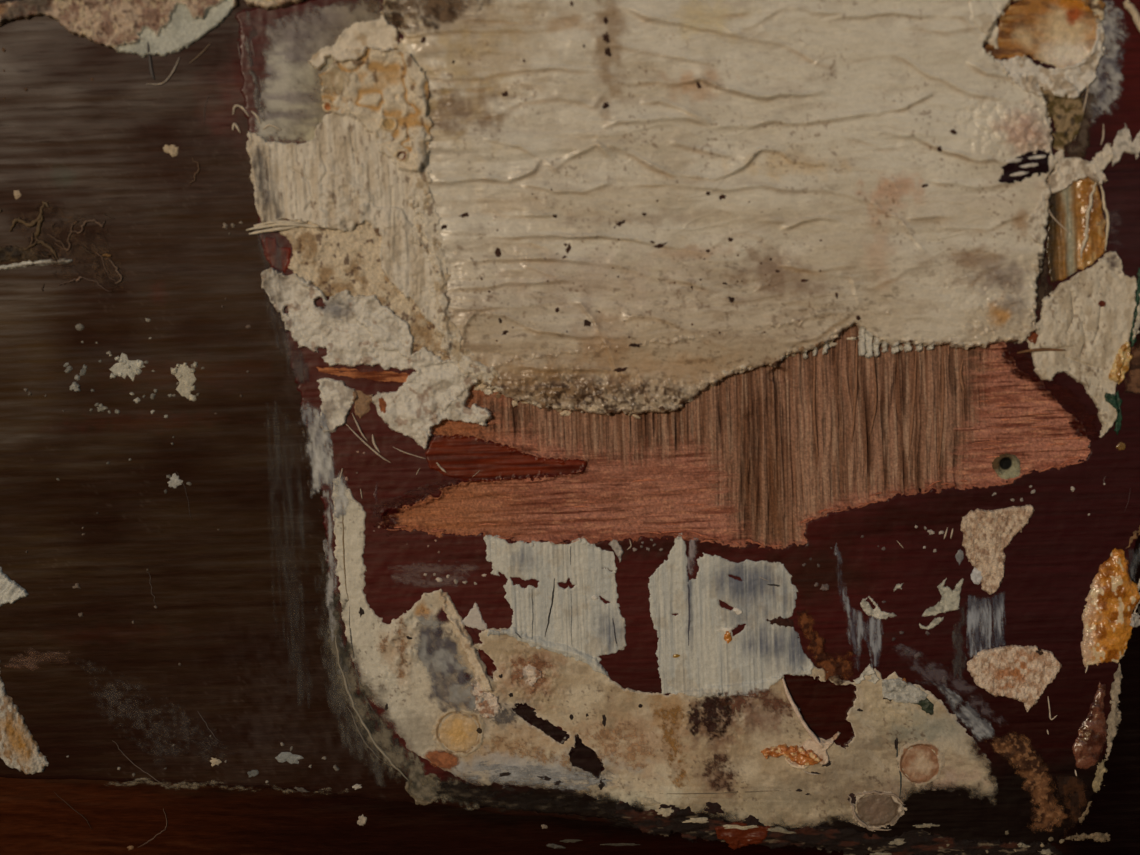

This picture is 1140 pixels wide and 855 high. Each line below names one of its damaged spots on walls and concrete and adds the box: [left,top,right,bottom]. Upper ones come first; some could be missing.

peeling [609,539,624,563]
peeling [919,505,1035,630]
peeling [0,567,29,607]
peeling [460,602,487,630]
peeling [716,608,743,644]
peeling [860,596,897,620]
peeling [853,664,934,715]
peeling [761,678,841,769]
peeling [638,797,674,817]
peeling [723,824,796,834]
peeling [546,839,583,849]